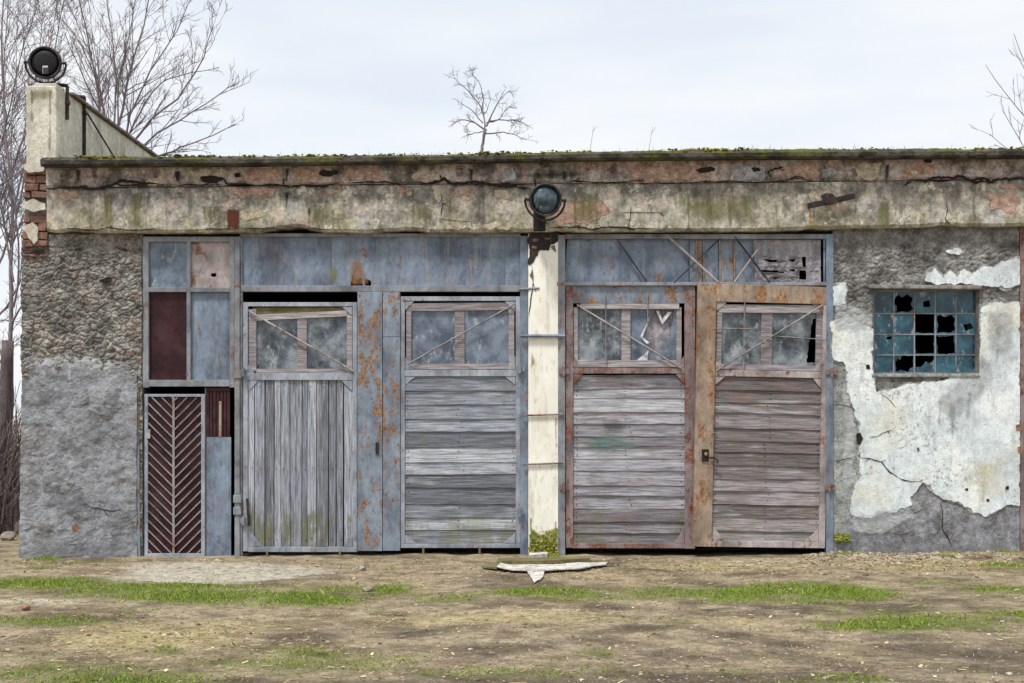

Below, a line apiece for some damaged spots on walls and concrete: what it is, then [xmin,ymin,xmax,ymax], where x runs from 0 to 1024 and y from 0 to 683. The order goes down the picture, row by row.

crack [54,175,533,226]
crack [896,175,1024,223]
peeling [527,200,610,279]
rust [351,260,366,284]
spalling [832,226,1019,329]
spalling [20,159,143,556]
crack [835,430,924,483]
spalling [833,361,1020,554]
crack [868,502,956,546]